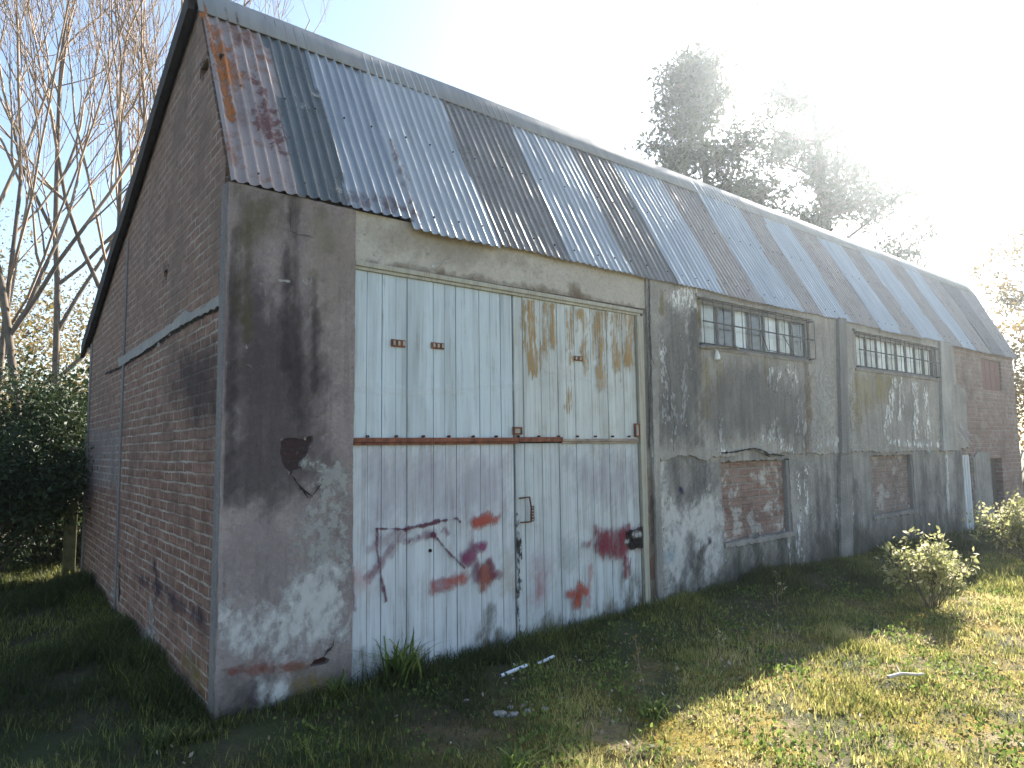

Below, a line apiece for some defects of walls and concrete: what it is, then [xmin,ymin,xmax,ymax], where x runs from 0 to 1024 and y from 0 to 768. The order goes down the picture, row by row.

corrosion [197,2,289,156]
damp [658,285,704,443]
crack [721,448,785,457]
damp [760,364,809,455]
damp [884,377,950,507]
peeling [218,436,352,662]
peeling [257,674,288,710]